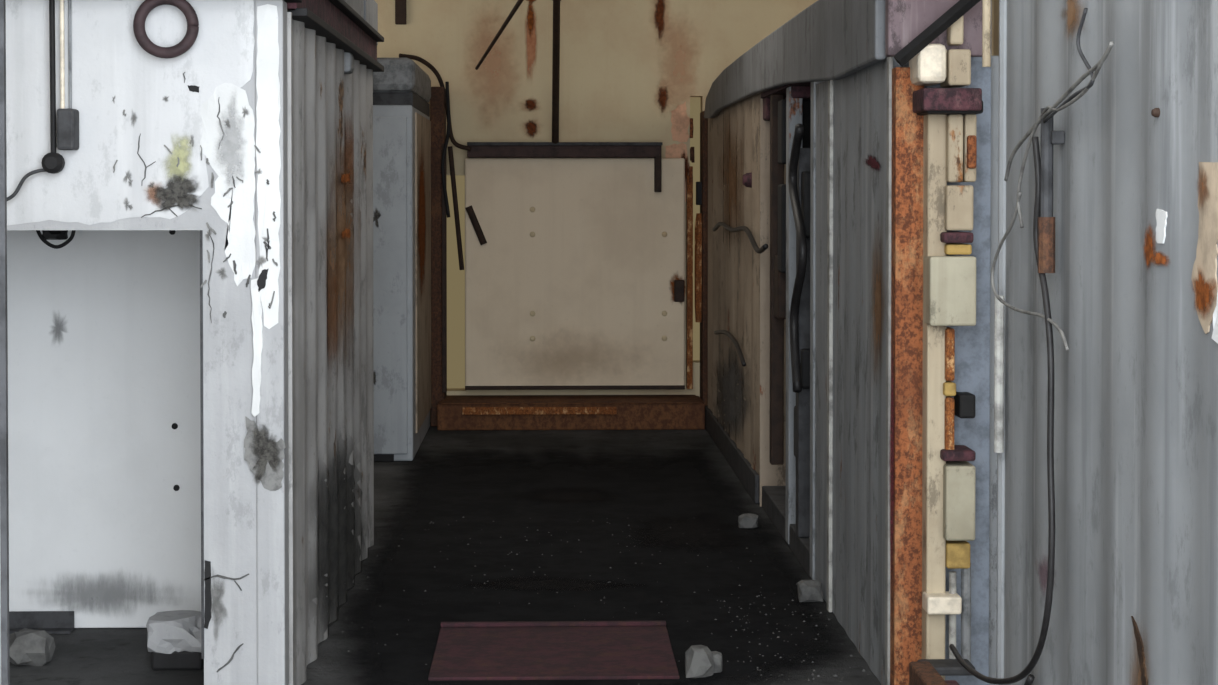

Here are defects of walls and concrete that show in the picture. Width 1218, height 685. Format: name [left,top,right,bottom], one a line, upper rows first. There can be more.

rust [655,0,665,39]
crack [137,133,156,182]
water stain [155,139,197,210]
crack [216,99,224,149]
peeling [6,0,285,491]
crack [141,205,214,323]
rust [327,125,354,348]
rust [1144,209,1168,267]
peeling [1191,162,1218,344]
water stain [318,451,362,628]
water stain [62,581,136,608]
rust [1131,616,1148,685]